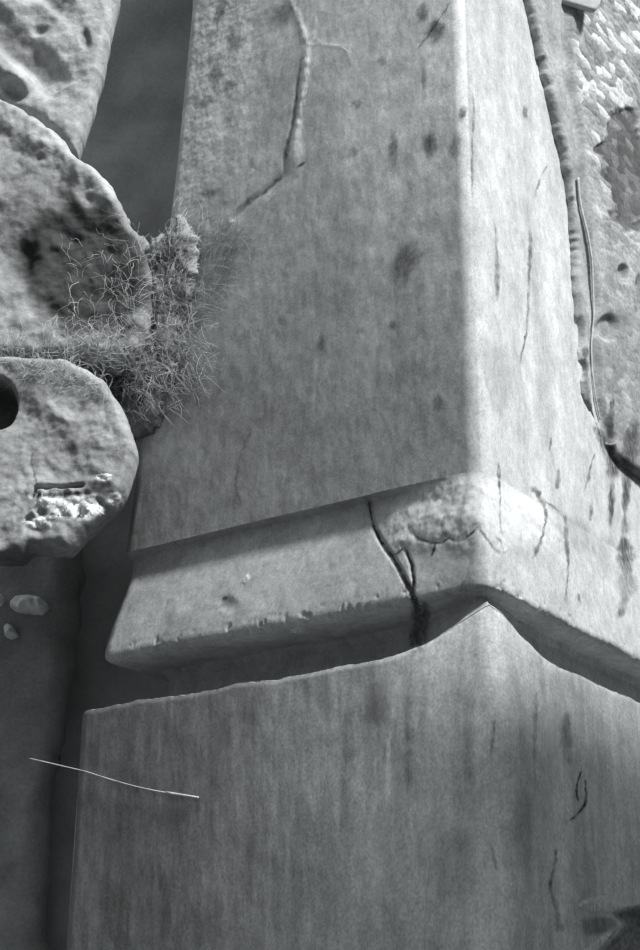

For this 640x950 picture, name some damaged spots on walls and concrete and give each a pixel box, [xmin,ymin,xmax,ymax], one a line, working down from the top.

crack [369,475,502,610]
crack [571,773,587,819]